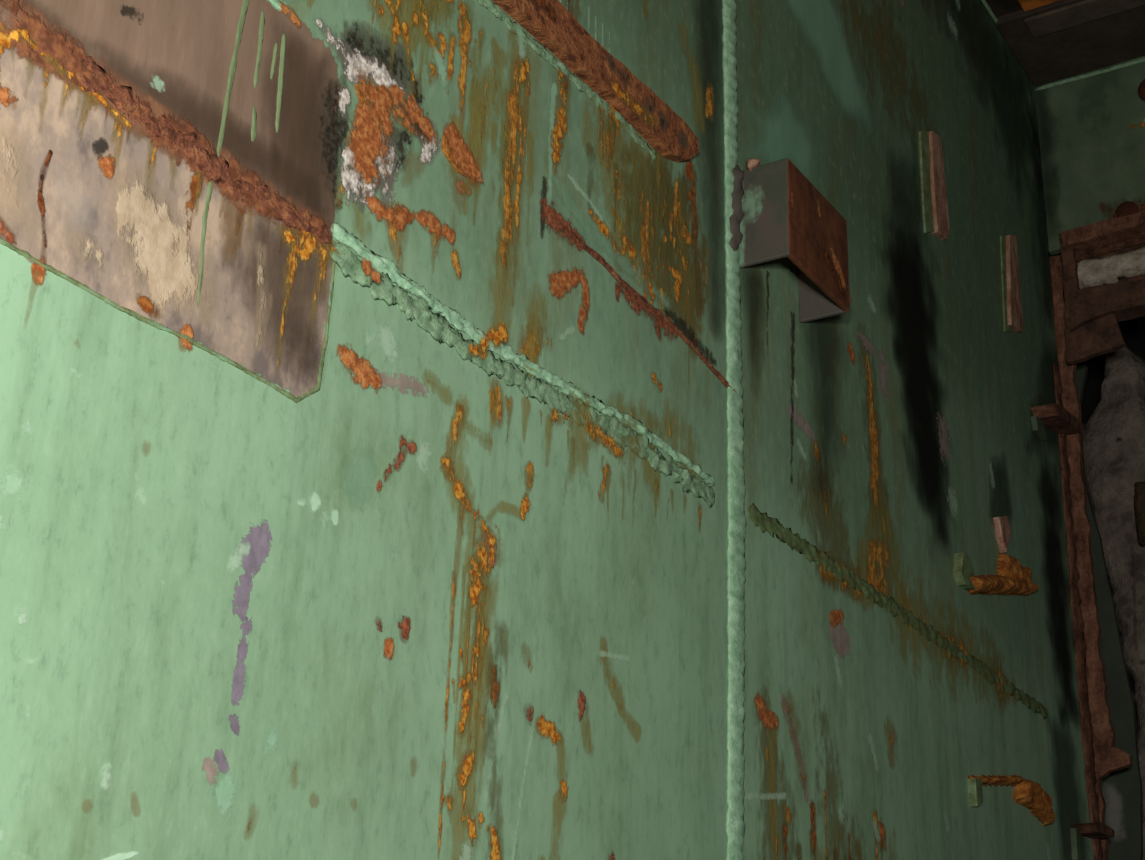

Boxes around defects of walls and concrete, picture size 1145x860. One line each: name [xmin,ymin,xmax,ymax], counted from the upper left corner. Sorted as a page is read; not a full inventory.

damp [84,238,103,266]
damp [116,179,198,308]
rust [0,0,341,336]
peeling [0,0,442,403]
rust [354,258,381,284]
rust [361,0,709,323]
rust [470,321,510,359]
rust [520,461,534,520]
rust [582,411,637,501]
rust [376,404,501,860]
rust [1058,434,1100,823]
rust [526,706,562,746]